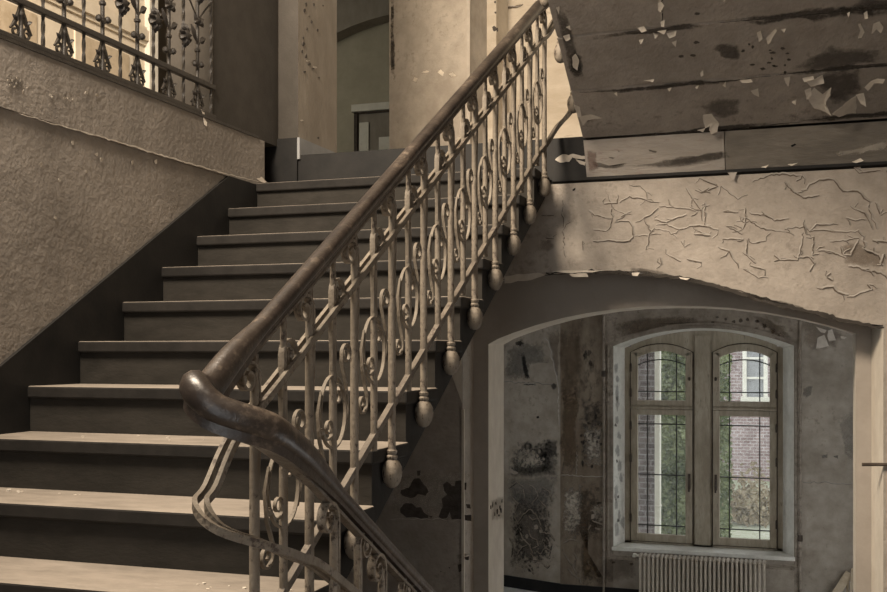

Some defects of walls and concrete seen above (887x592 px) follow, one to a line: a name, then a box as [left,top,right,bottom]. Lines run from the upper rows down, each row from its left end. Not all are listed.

peeling [556,6,582,72]
peeling [612,20,698,47]
peeling [858,11,883,38]
peeling [792,72,885,117]
crack [0,106,259,182]
peeling [555,151,622,168]
peeling [643,150,722,166]
peeling [698,114,719,134]
crack [542,167,887,300]
spalling [503,269,884,349]
leakage [509,393,602,475]
peeling [400,470,471,521]